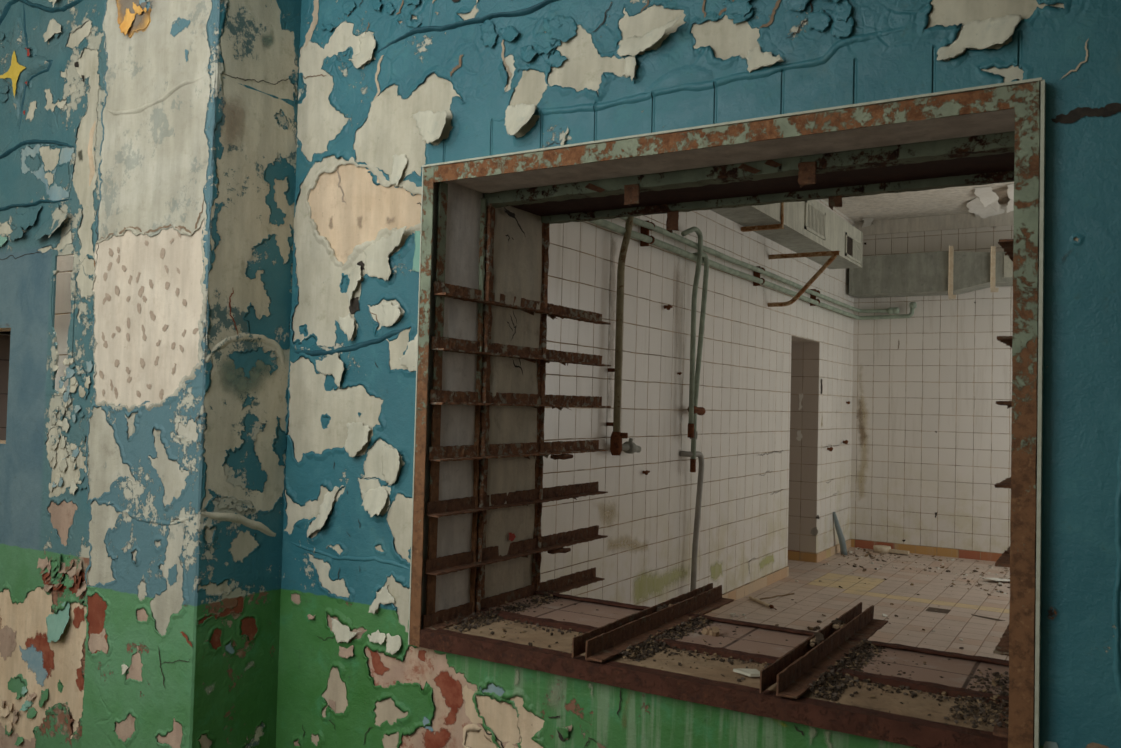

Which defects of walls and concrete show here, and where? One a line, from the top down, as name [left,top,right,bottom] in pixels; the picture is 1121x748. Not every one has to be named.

peeling [455,0,787,148]
peeling [786,0,854,38]
peeling [917,0,1071,85]
peeling [966,184,1014,219]
peeling [0,0,550,748]
spalling [733,668,760,677]